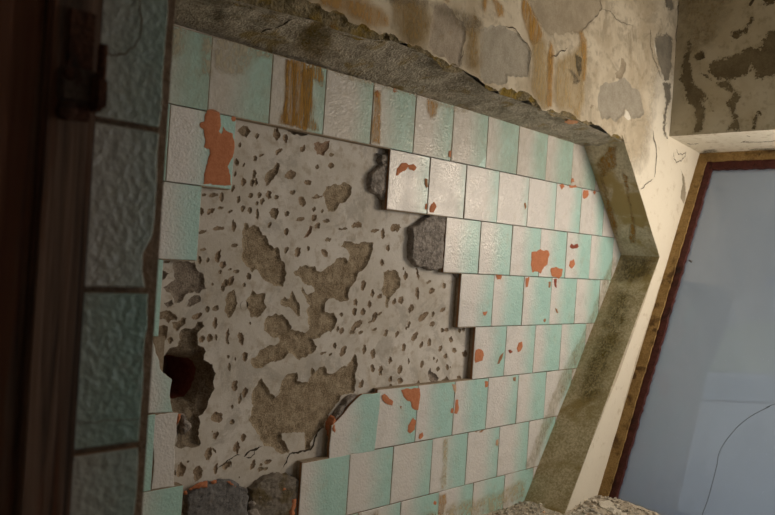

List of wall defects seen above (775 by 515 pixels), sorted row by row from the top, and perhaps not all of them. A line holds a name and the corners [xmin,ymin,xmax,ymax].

corrosion [281,60,324,130]
spalling [231,0,467,74]
corrosion [522,0,542,43]
flaking render [477,25,594,126]
flaking render [528,0,602,36]
corrosion [547,32,586,115]
flaking render [590,58,644,122]
spalling [158,109,484,482]
peeling [526,249,575,288]
leakage [583,292,629,397]